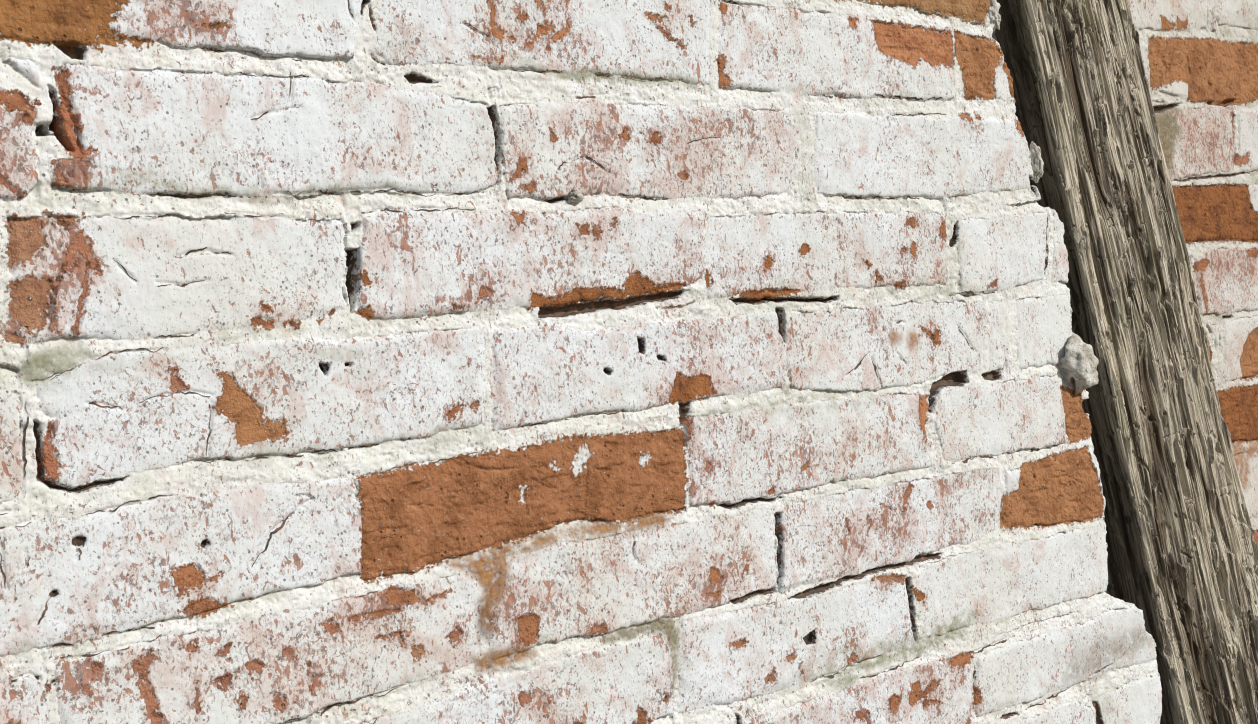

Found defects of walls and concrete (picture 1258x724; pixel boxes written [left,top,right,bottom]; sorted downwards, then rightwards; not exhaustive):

spalling [0,0,159,192]
spalling [836,0,1016,125]
spalling [1148,14,1258,137]
peeling [0,160,103,348]
peeling [528,270,692,311]
peeling [728,286,801,302]
peeling [1193,259,1210,314]
spalling [1172,181,1258,258]
peeling [210,370,291,447]
spalling [319,372,717,662]
spalling [1000,384,1105,531]
spalling [1217,327,1258,444]